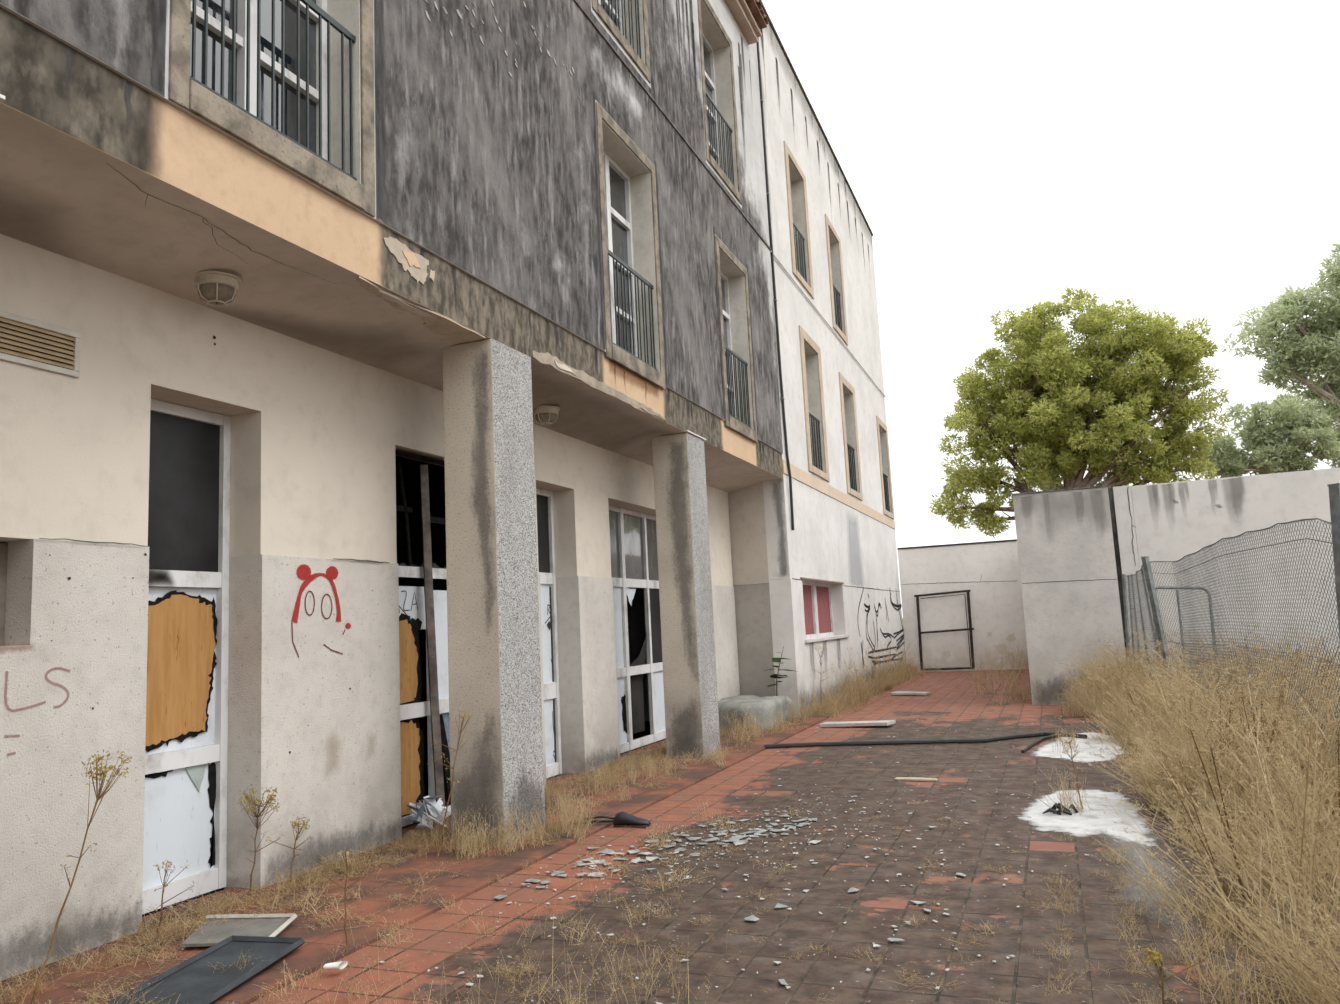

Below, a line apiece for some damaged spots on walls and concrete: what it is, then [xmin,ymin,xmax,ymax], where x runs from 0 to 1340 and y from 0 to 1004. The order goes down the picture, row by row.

peeling [416,0,502,45]
water stain [0,0,167,174]
crack [108,164,333,283]
flaking render [383,236,435,285]
water stain [374,0,783,478]